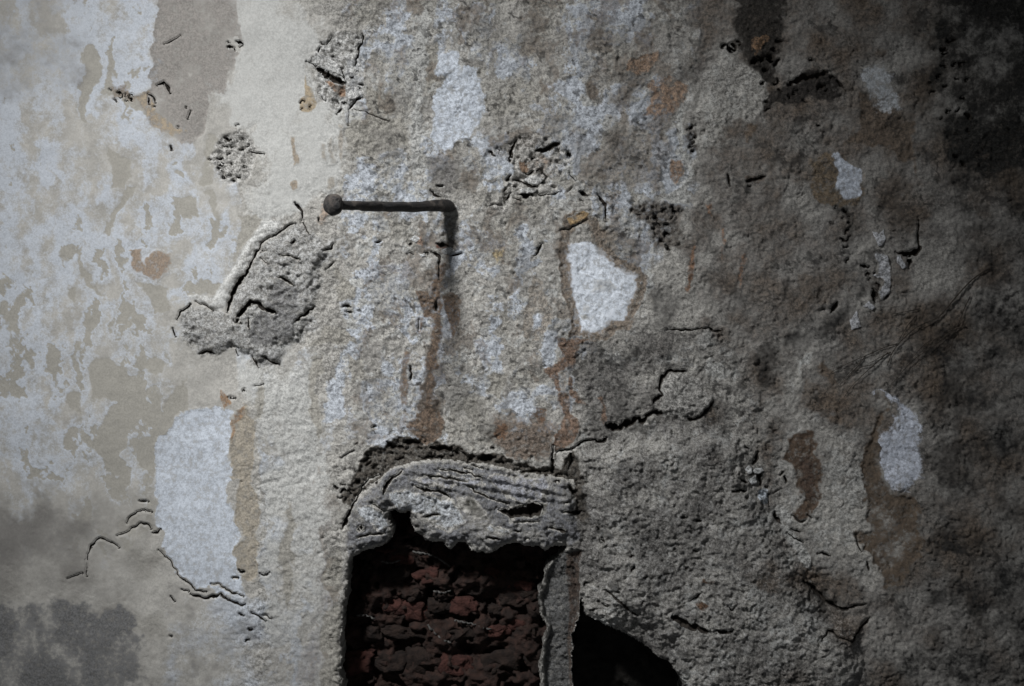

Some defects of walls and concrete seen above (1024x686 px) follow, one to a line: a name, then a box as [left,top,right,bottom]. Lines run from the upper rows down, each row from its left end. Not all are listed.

peeling [106,0,264,189]
damp [720,0,849,119]
damp [902,0,1024,193]
rust [313,199,331,228]
peeling [482,127,650,346]
peeling [152,382,264,598]
rust [398,251,465,446]
spalling [334,425,592,526]
crack [556,368,687,454]
crack [687,401,714,423]
damp [0,590,154,686]
crack [68,499,272,642]